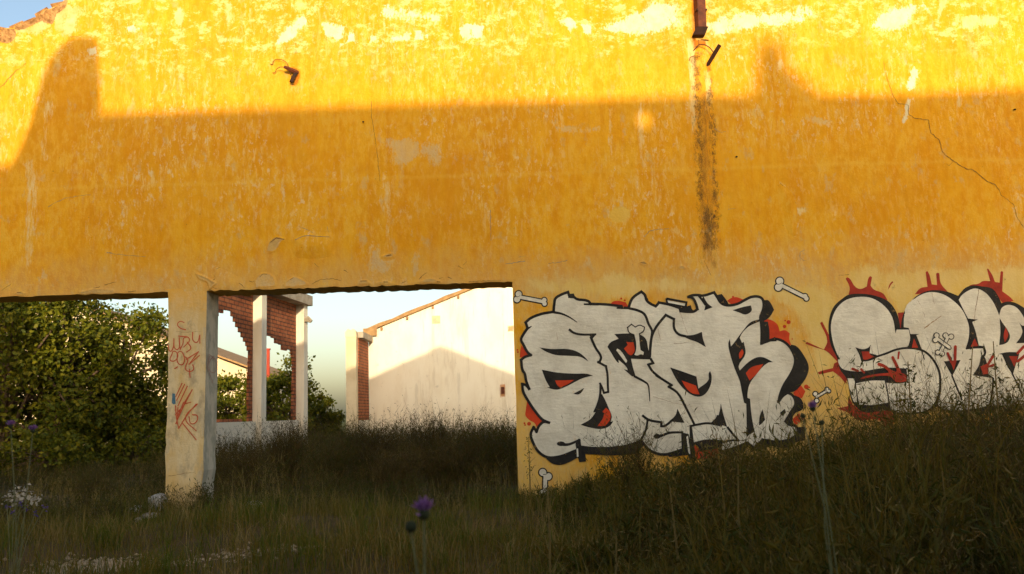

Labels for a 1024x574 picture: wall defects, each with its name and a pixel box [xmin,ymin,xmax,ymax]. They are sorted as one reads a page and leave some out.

peeling [270,0,488,49]
peeling [554,0,693,46]
peeling [704,0,829,45]
peeling [862,0,1010,52]
leakage [677,33,719,249]
crack [883,61,1023,226]
spalling [253,271,312,289]
peeling [356,233,444,286]